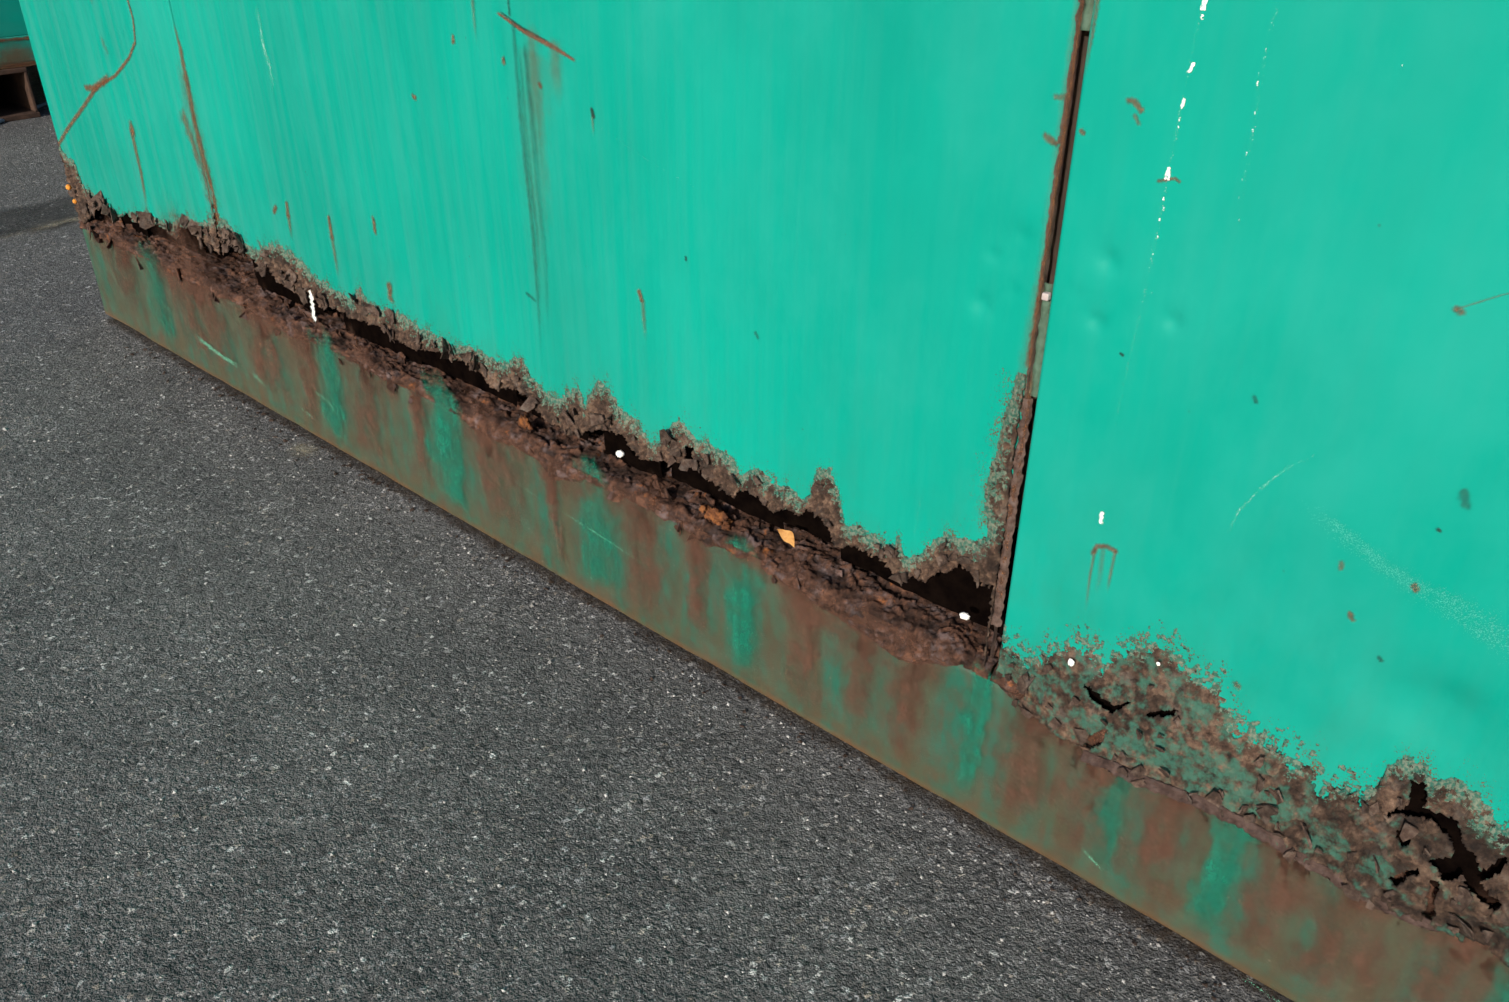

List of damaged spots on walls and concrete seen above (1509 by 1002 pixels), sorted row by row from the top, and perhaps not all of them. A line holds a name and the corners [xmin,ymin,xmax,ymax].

corrosion [516,414,533,430]
corrosion [699,504,733,531]
spalling [580,431,1014,635]
corrosion [1156,628,1178,645]
crack [1387,780,1508,911]
corrosion [1375,900,1440,932]